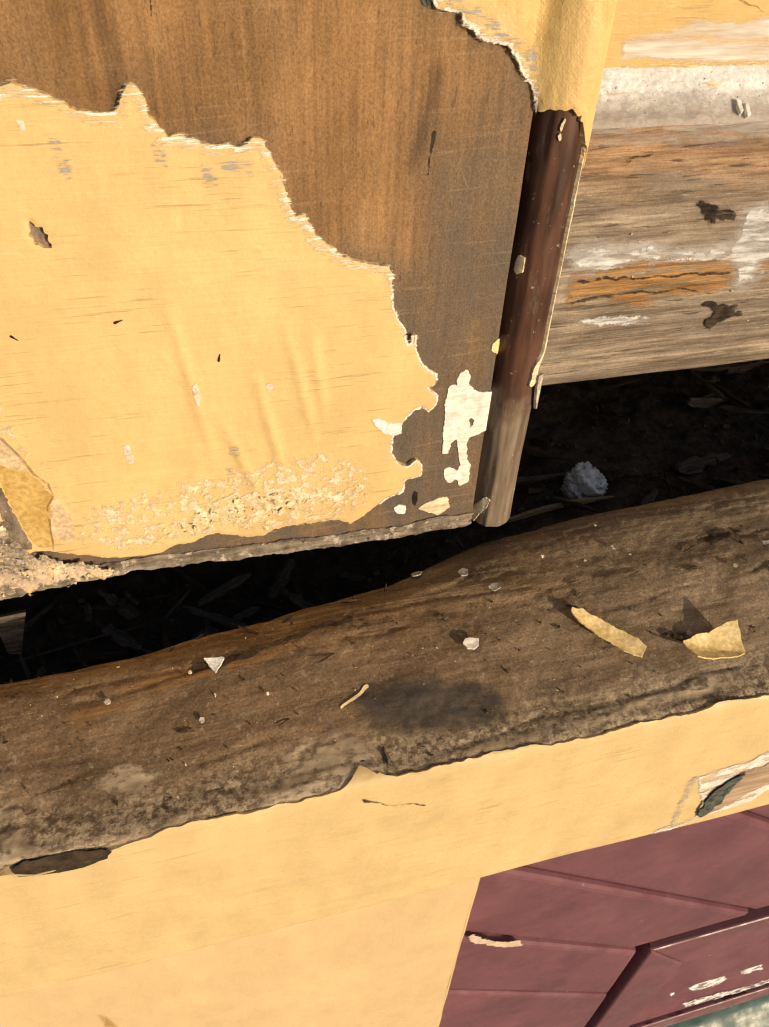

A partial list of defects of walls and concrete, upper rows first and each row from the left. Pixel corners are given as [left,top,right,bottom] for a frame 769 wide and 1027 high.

peeling [0,0,539,600]
peeling [463,638,479,650]